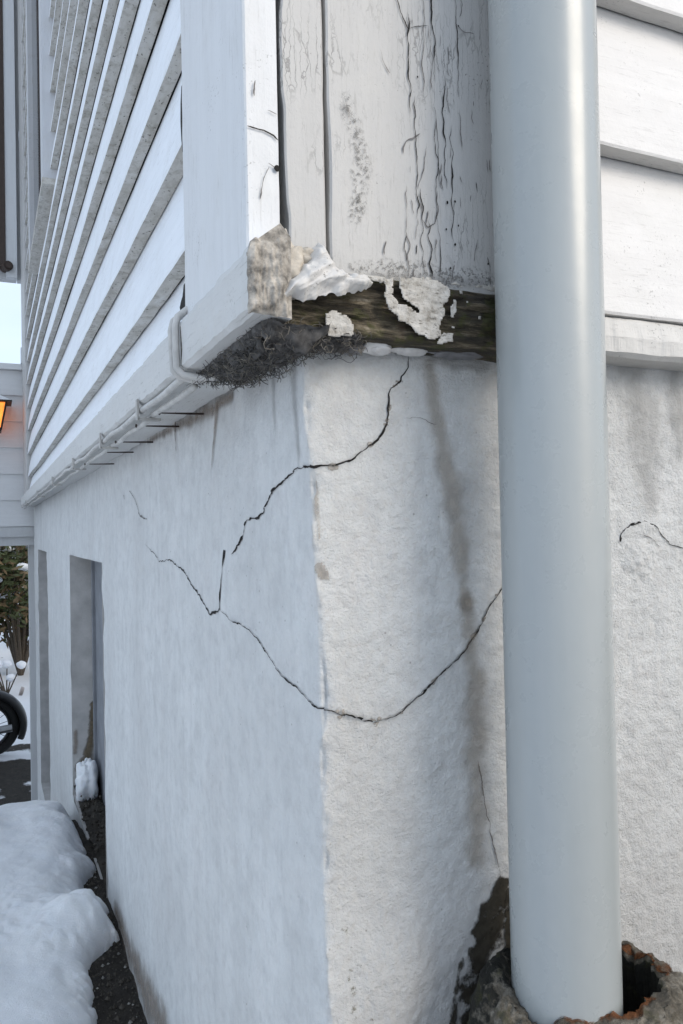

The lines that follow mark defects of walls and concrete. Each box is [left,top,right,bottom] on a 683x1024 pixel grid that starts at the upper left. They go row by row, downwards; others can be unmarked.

water stain [346,99,368,217]
crack [382,0,491,286]
peeling [325,310,354,337]
peeling [367,275,495,344]
crack [151,358,502,727]
crack [620,521,682,548]
peeling [450,876,511,1024]
rust [622,944,671,975]
rust [553,997,656,1024]